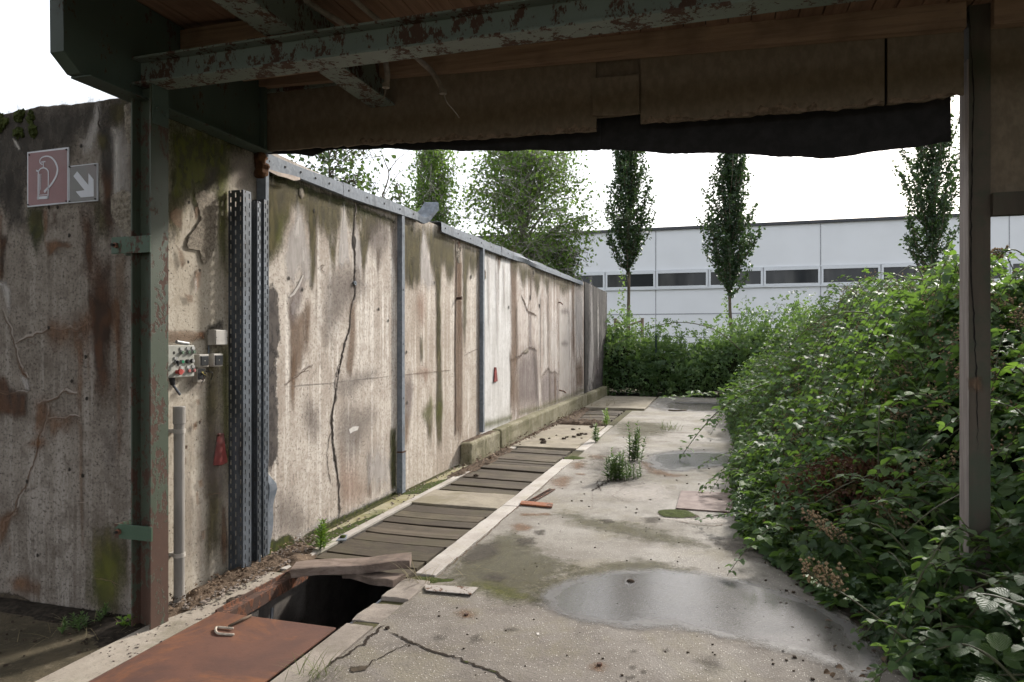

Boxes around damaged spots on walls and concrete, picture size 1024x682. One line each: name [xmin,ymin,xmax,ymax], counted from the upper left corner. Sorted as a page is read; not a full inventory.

rust [0,377,66,431]
crack [7,387,80,519]
crack [2,308,88,377]
leakage [268,345,279,469]
leakage [290,306,310,400]
leakage [287,212,316,286]
crack [285,202,379,518]
leakage [330,215,380,268]
leakage [410,235,441,333]
leakage [478,257,518,406]
leakage [569,286,599,387]
crack [326,625,511,682]